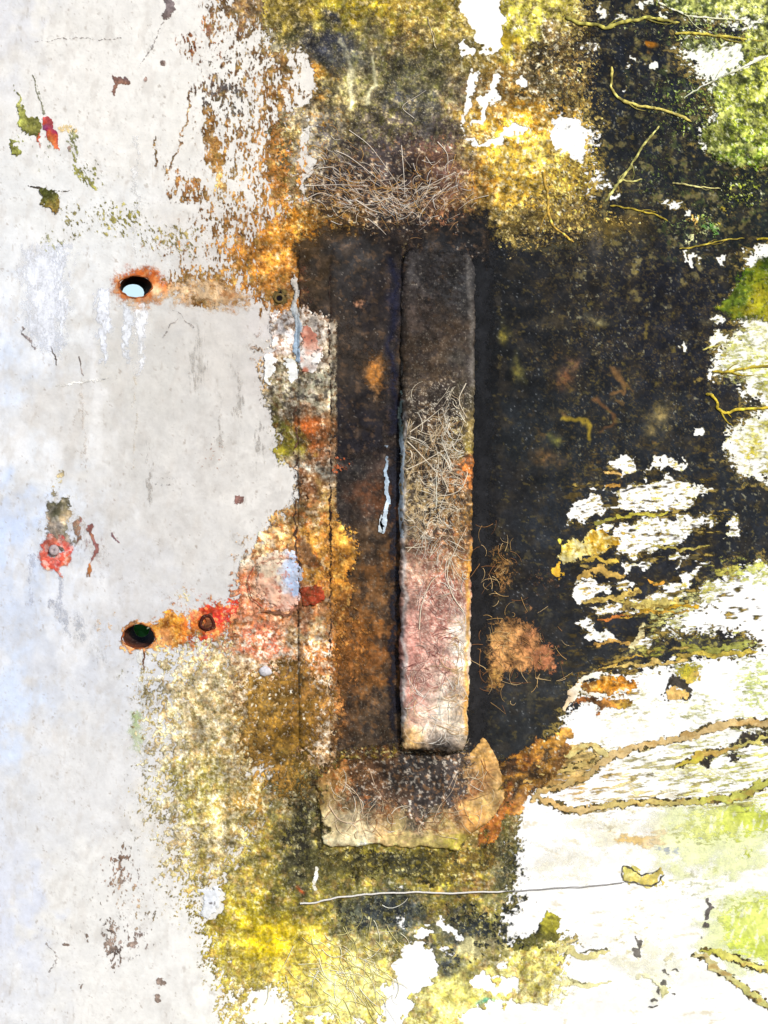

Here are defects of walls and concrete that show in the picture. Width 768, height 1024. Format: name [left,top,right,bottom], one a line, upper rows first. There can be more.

peeling [161,0,176,20]
peeling [264,274,323,385]
rust [97,0,373,774]
water stain [292,0,768,825]
rust [39,517,99,578]
peeling [100,842,156,973]
water stain [281,790,318,891]
water stain [330,874,431,933]
water stain [443,839,529,976]
rust [478,727,574,847]
spalling [621,866,665,888]
peeling [701,898,714,939]